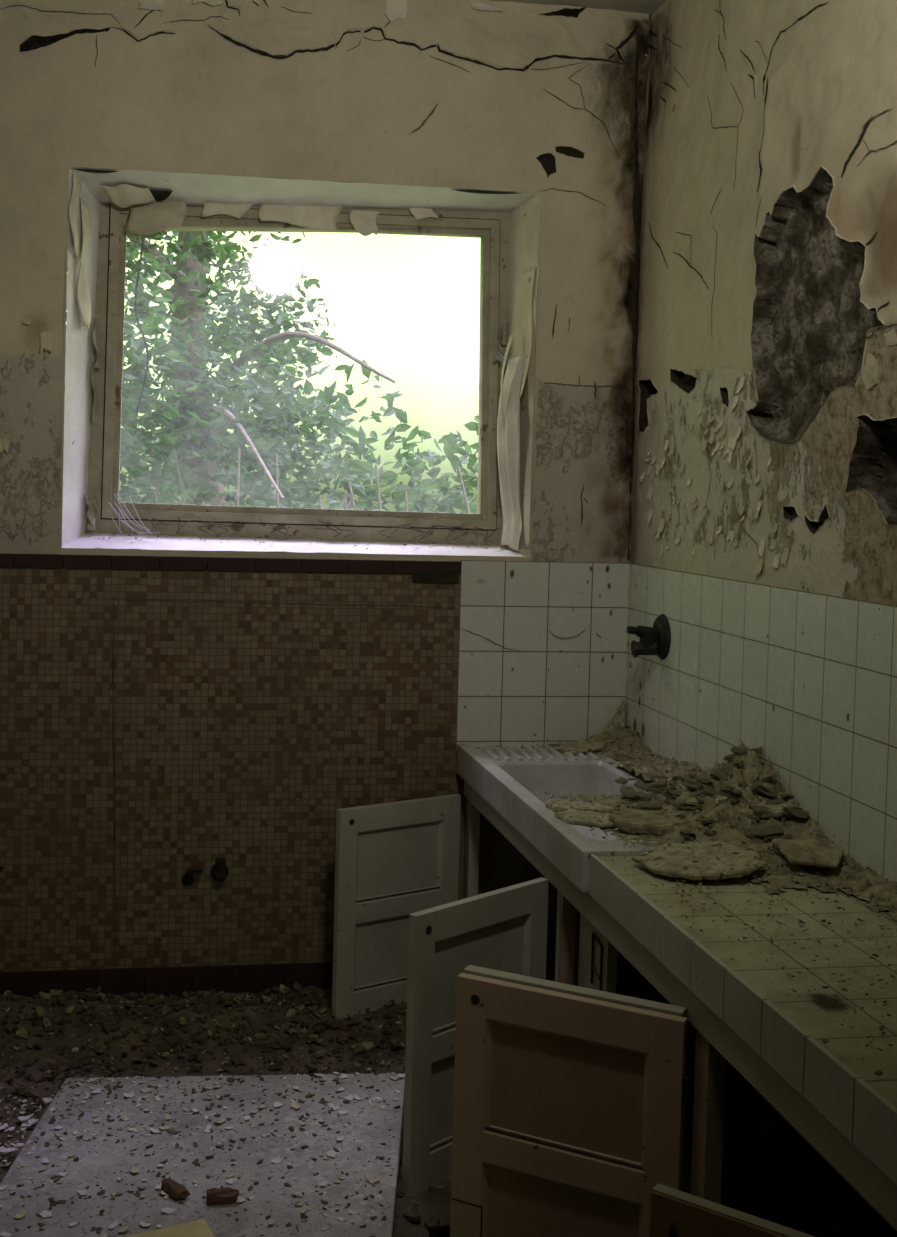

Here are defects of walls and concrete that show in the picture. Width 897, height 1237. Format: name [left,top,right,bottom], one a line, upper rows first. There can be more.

crack [2,0,829,333]
spalling [535,145,585,179]
crack [840,108,897,178]
peeling [202,203,380,236]
peeling [69,168,187,421]
leakage [604,21,668,560]
crack [852,302,897,347]
spalling [638,379,659,432]
spalling [670,368,698,394]
spalling [688,165,897,557]
peeling [639,440,707,557]
peeling [754,504,830,575]